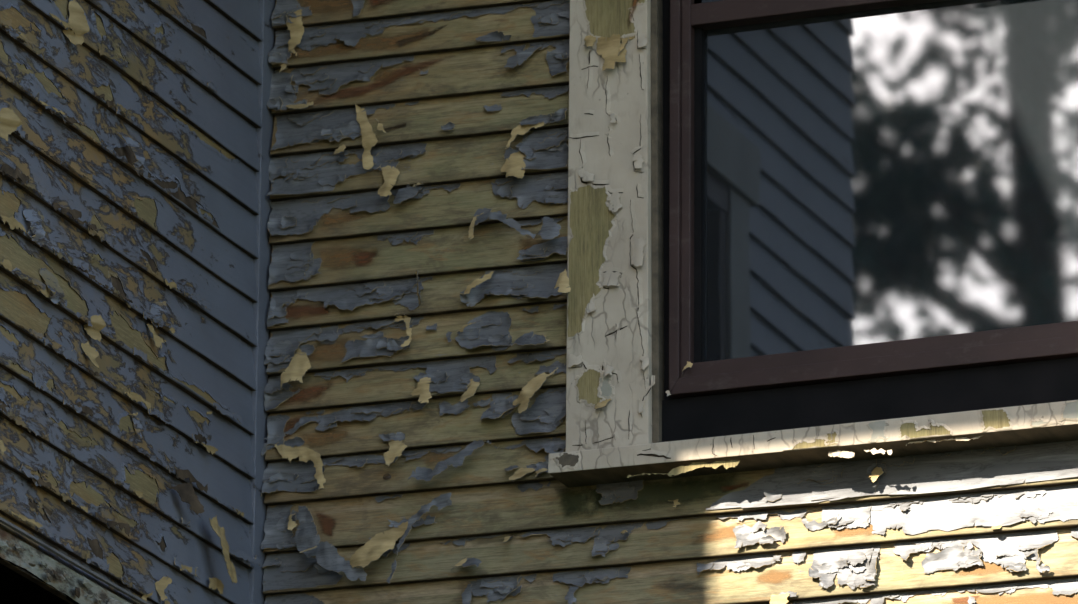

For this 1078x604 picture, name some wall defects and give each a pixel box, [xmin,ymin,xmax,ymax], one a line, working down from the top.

peeling [583,0,648,71]
peeling [0,0,623,604]
crack [568,12,672,459]
crack [712,434,776,456]
peeling [441,408,1078,604]
peeling [1030,400,1078,427]